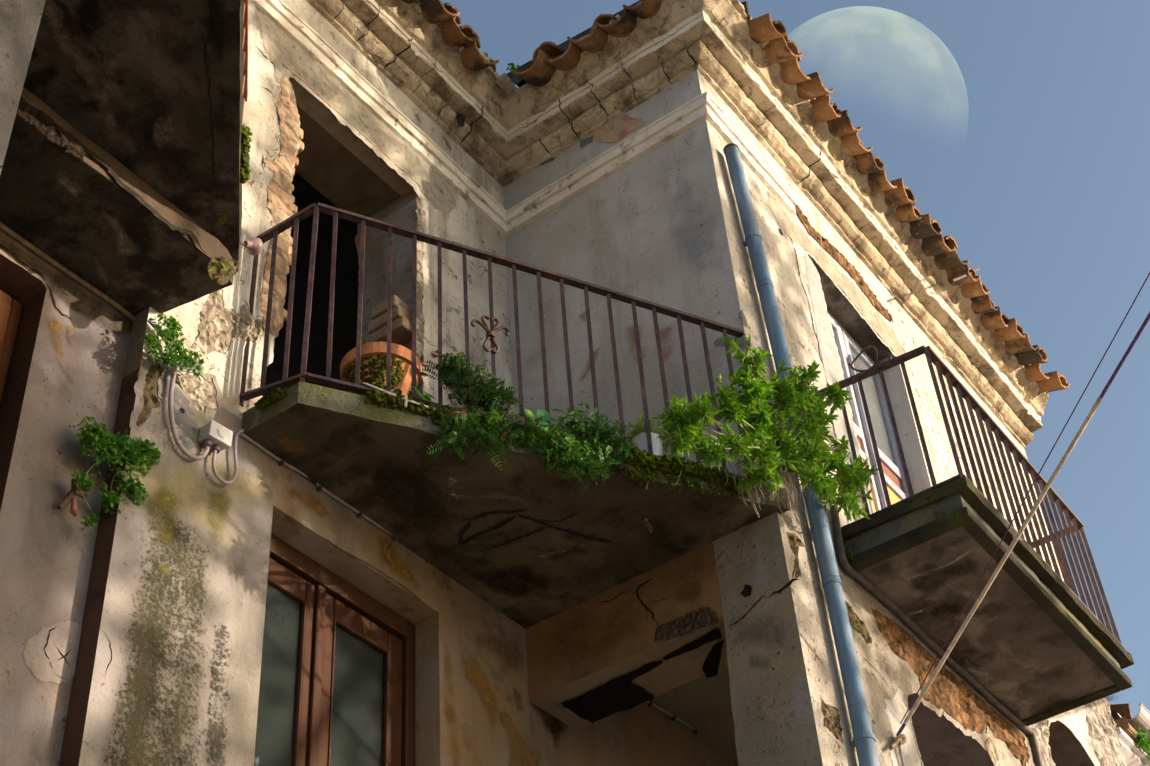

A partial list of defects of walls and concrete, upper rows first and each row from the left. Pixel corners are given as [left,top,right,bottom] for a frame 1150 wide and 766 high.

crack [354,5,380,42]
crack [382,35,412,71]
crack [661,45,696,84]
spalling [129,3,462,454]
water stain [50,275,133,333]
crack [458,510,625,549]
crack [731,565,799,625]
crack [44,626,71,681]
mould [101,491,231,766]
spalling [655,607,718,642]
spalling [844,597,1056,766]
spalling [1082,698,1127,766]